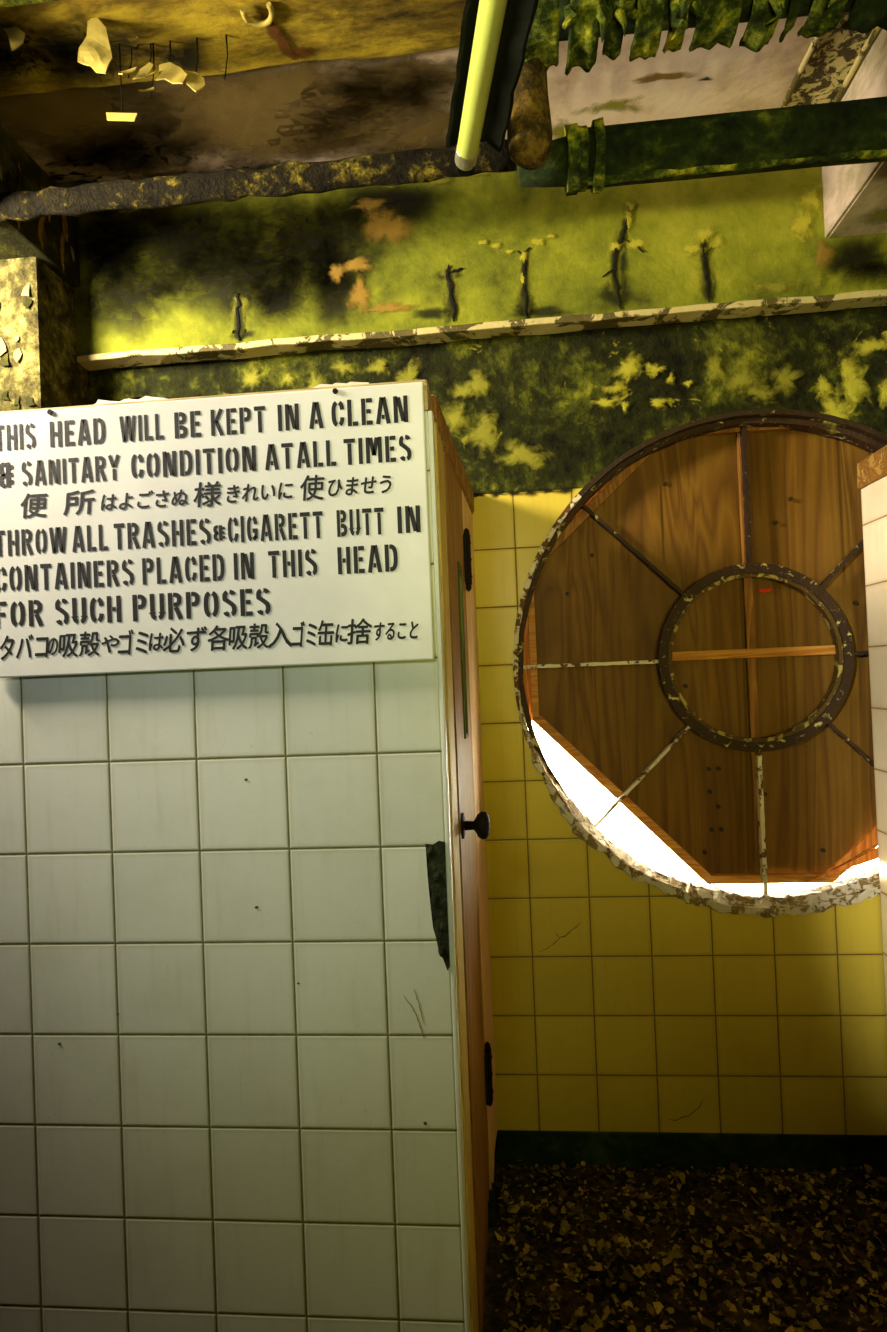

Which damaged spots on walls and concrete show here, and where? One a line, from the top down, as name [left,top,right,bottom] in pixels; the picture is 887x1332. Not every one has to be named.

rust [240,2,311,60]
leakage [0,55,456,188]
leakage [79,187,435,327]
leakage [829,239,887,282]
spalling [425,841,450,971]